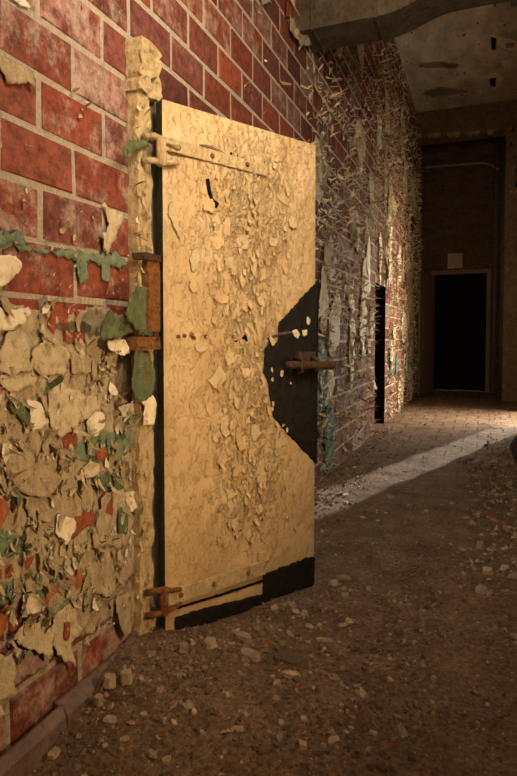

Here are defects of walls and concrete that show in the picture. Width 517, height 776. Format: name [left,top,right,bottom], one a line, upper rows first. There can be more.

flaking render [286,0,312,50]
peeling [0,54,36,88]
peeling [122,102,153,161]
peeling [211,38,494,554]